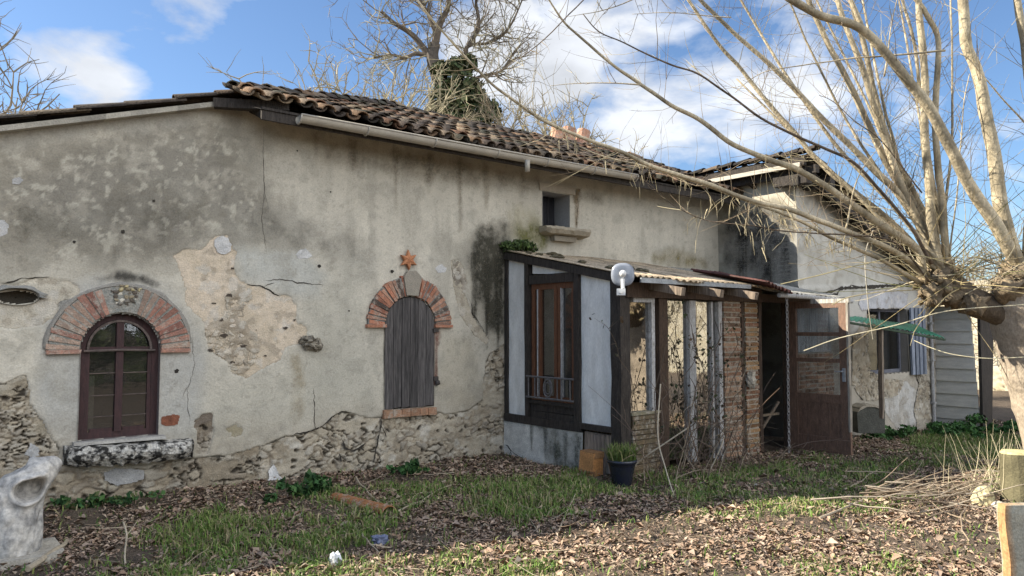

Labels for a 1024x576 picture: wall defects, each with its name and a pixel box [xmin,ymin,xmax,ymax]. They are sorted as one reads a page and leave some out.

flaking render [173,235,308,378]
crack [247,279,321,296]
water stain [472,253,502,339]
flaking render [885,381,922,430]
flaking render [194,413,243,455]